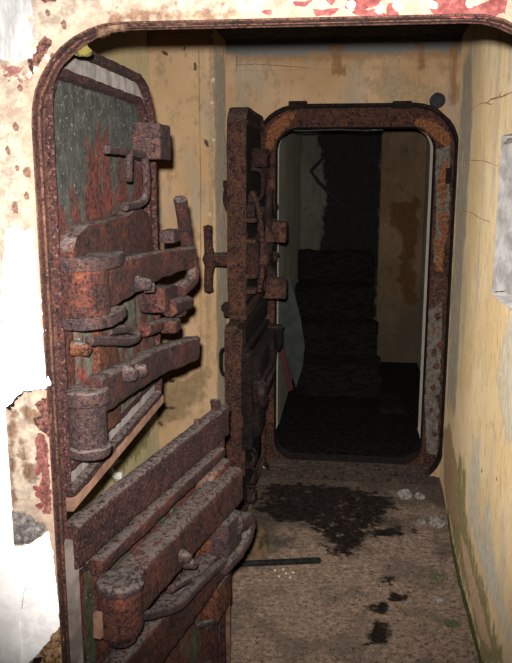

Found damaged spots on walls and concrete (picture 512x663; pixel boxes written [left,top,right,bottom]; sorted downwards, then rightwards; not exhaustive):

peeling [293,0,404,16]
peeling [428,0,508,19]
crack [466,90,512,113]
rust [265,112,298,150]
rust [409,116,452,147]
rust [429,159,449,333]
peeling [33,433,52,514]
damp [255,482,404,559]
damp [447,455,502,663]
damp [364,576,408,614]
rust [39,627,64,663]
damp [363,621,392,645]